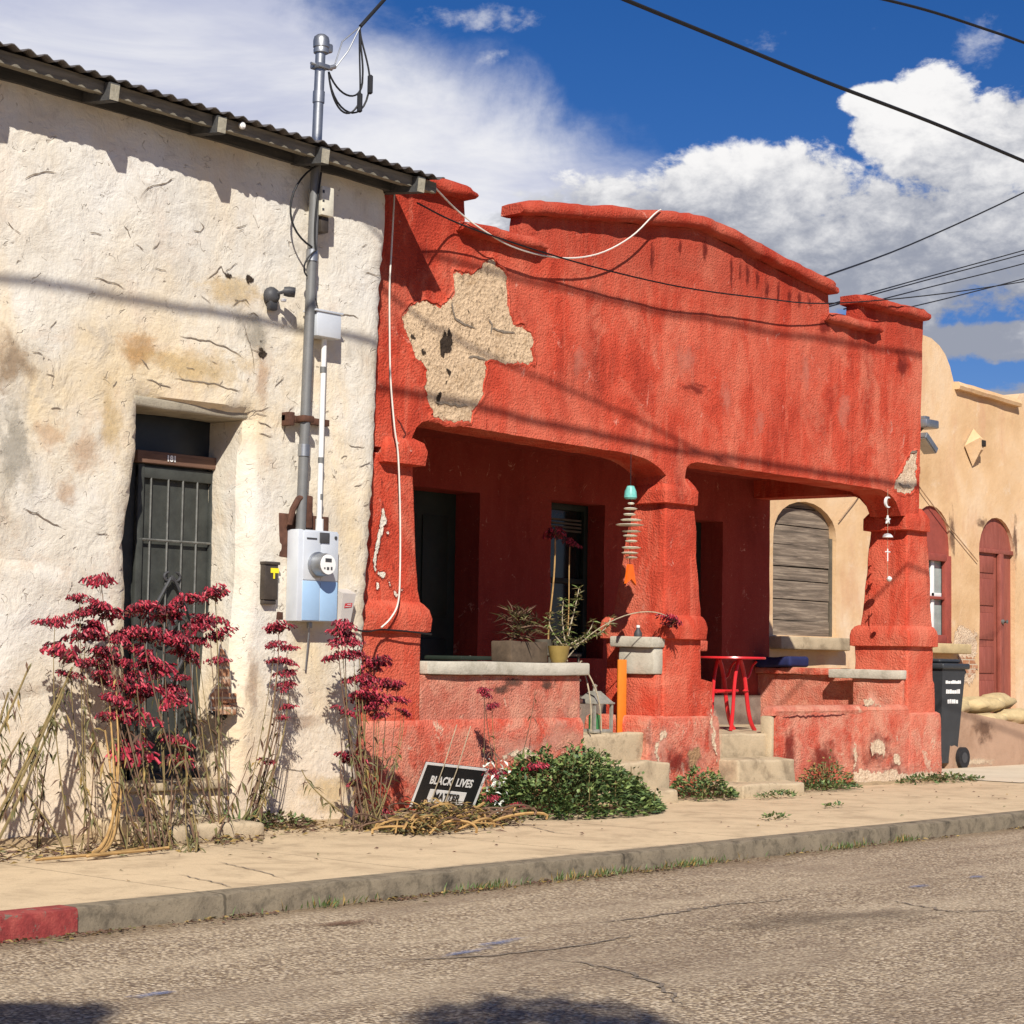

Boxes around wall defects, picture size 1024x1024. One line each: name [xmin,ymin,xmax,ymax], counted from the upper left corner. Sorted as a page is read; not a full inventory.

flaking render [399,254,537,427]
spalling [892,448,919,498]
peeling [372,503,404,598]
peeling [851,739,937,783]